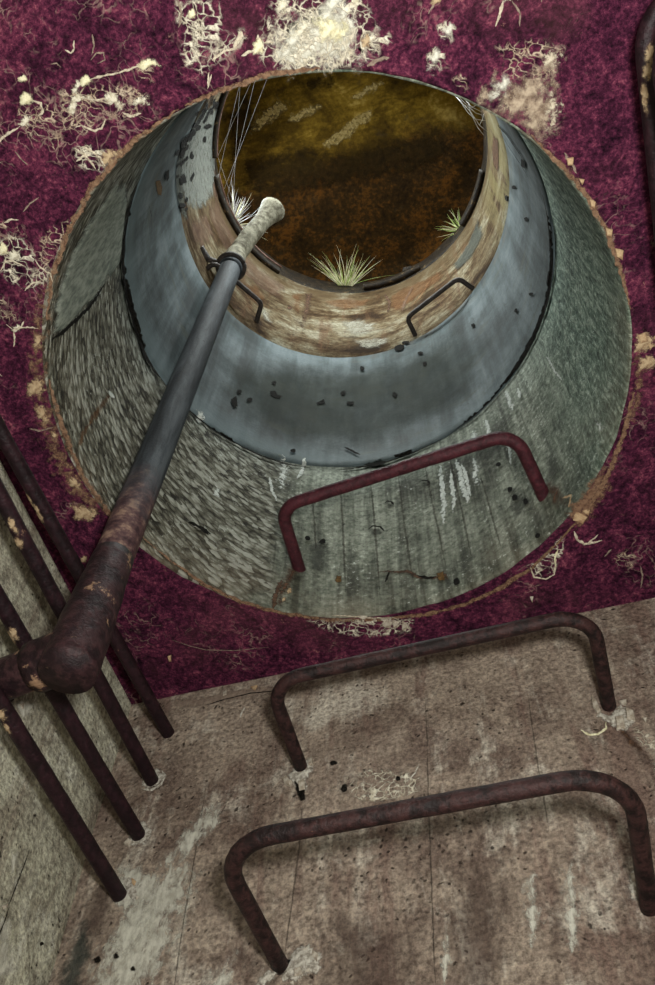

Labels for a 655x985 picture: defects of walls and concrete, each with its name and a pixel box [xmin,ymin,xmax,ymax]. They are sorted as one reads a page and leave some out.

peeling [156,99,220,219]
corrosion [531,134,631,310]
corrosion [27,66,333,521]
damp [438,458,481,523]
corrosion [587,392,635,511]
corrosion [143,524,576,623]